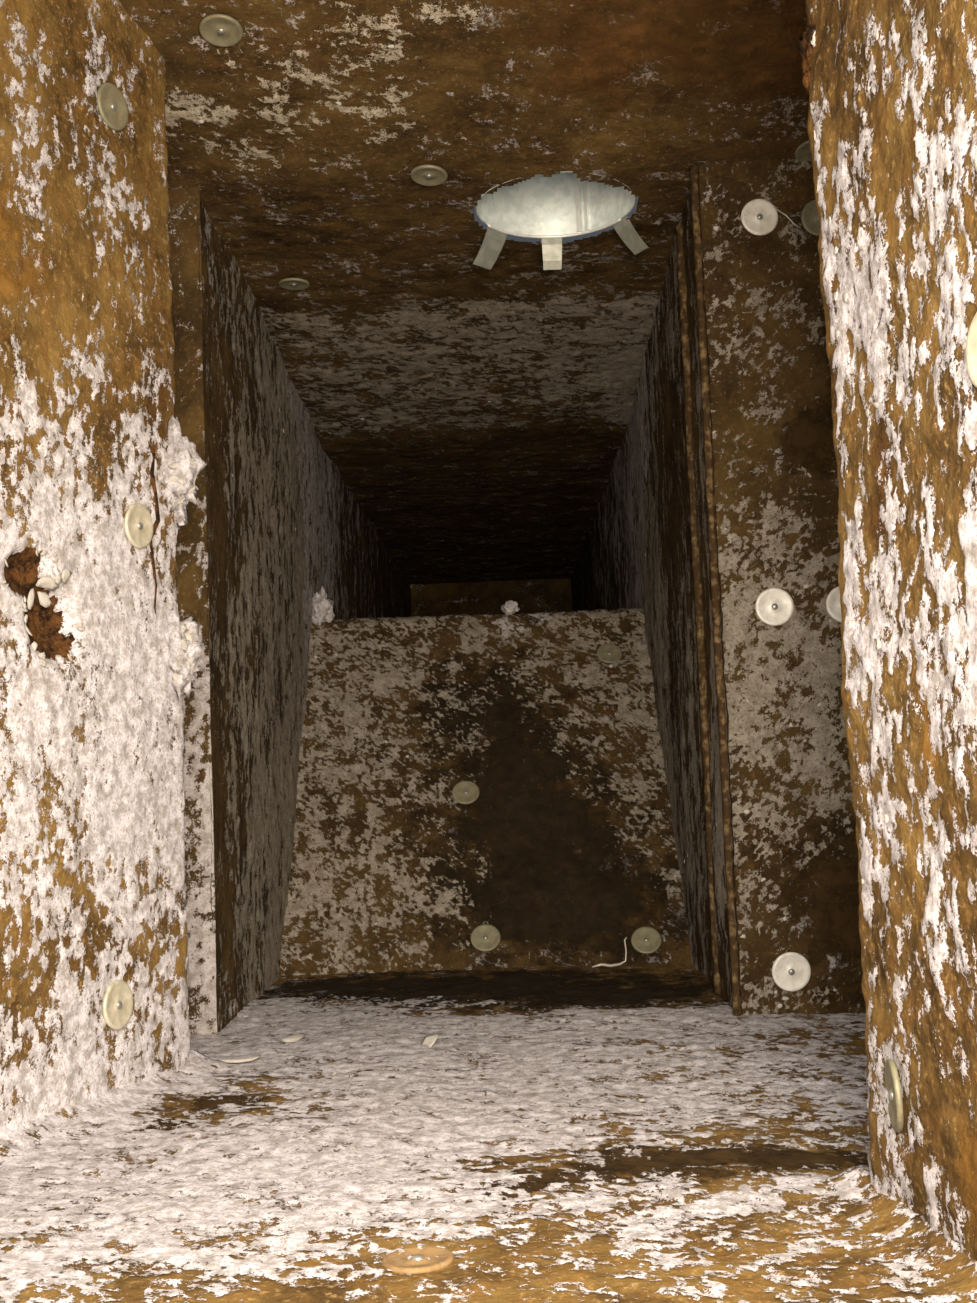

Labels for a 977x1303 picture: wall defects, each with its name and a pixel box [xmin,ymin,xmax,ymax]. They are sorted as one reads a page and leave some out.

leakage [0,0,36,88]
leakage [810,0,874,153]
leakage [0,183,53,301]
peeling [22,596,47,667]
leakage [146,1095,273,1131]